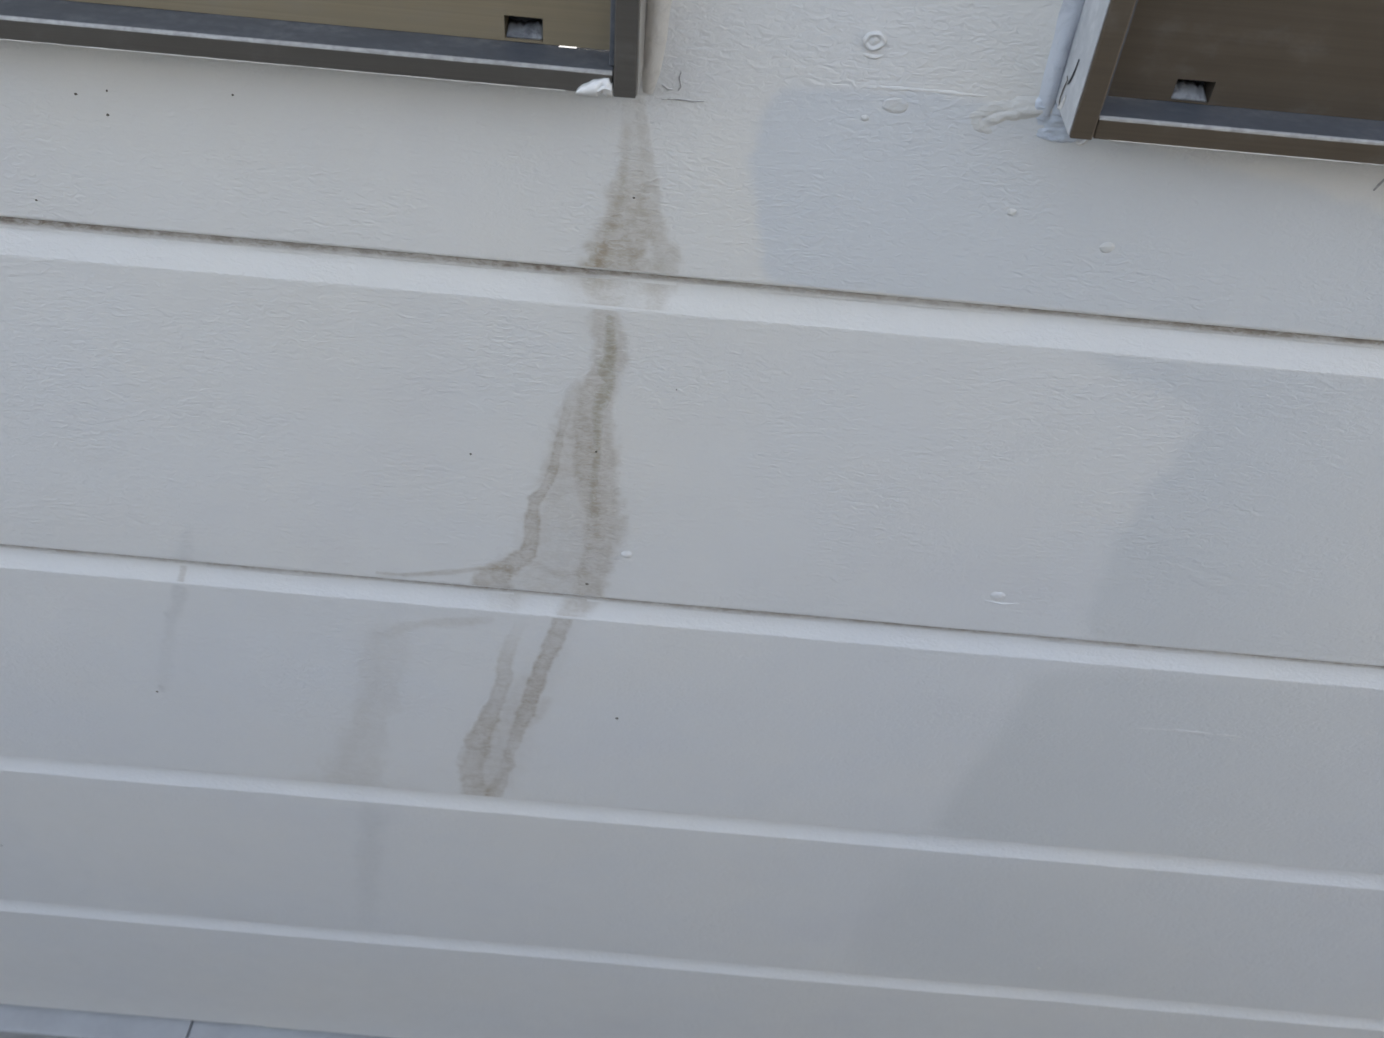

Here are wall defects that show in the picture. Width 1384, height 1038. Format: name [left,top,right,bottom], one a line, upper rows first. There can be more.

water stain [293,85,686,931]